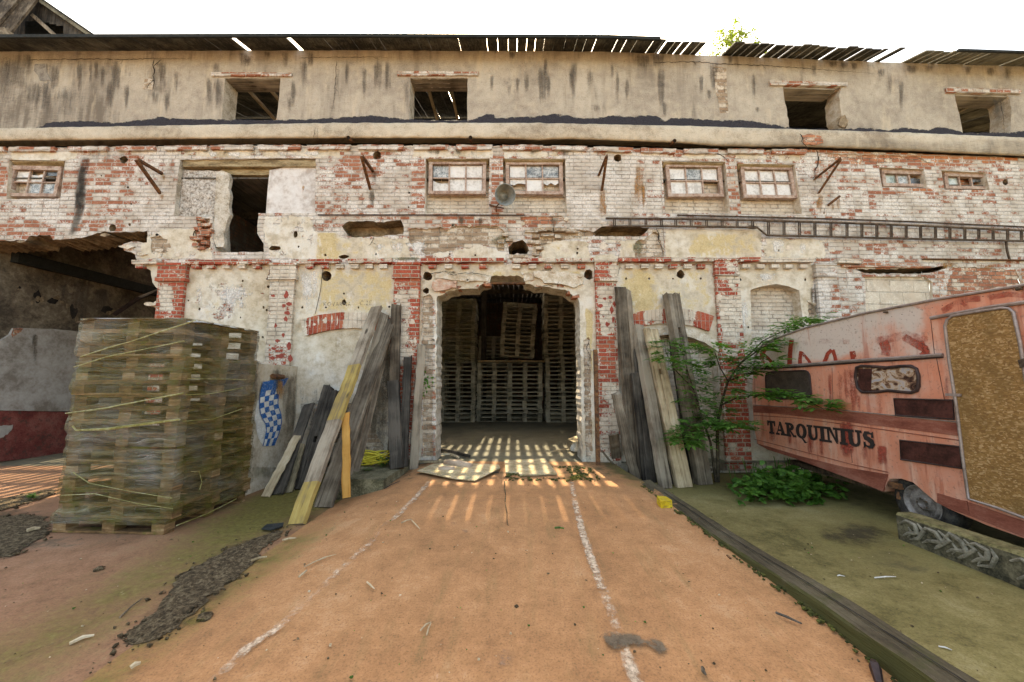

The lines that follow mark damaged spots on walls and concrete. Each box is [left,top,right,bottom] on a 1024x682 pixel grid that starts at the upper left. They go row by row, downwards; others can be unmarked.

water stain [77,63,128,105]
water stain [75,161,87,207]
flaking render [339,216,664,259]
flaking render [857,264,1021,296]
peeling [270,291,293,362]